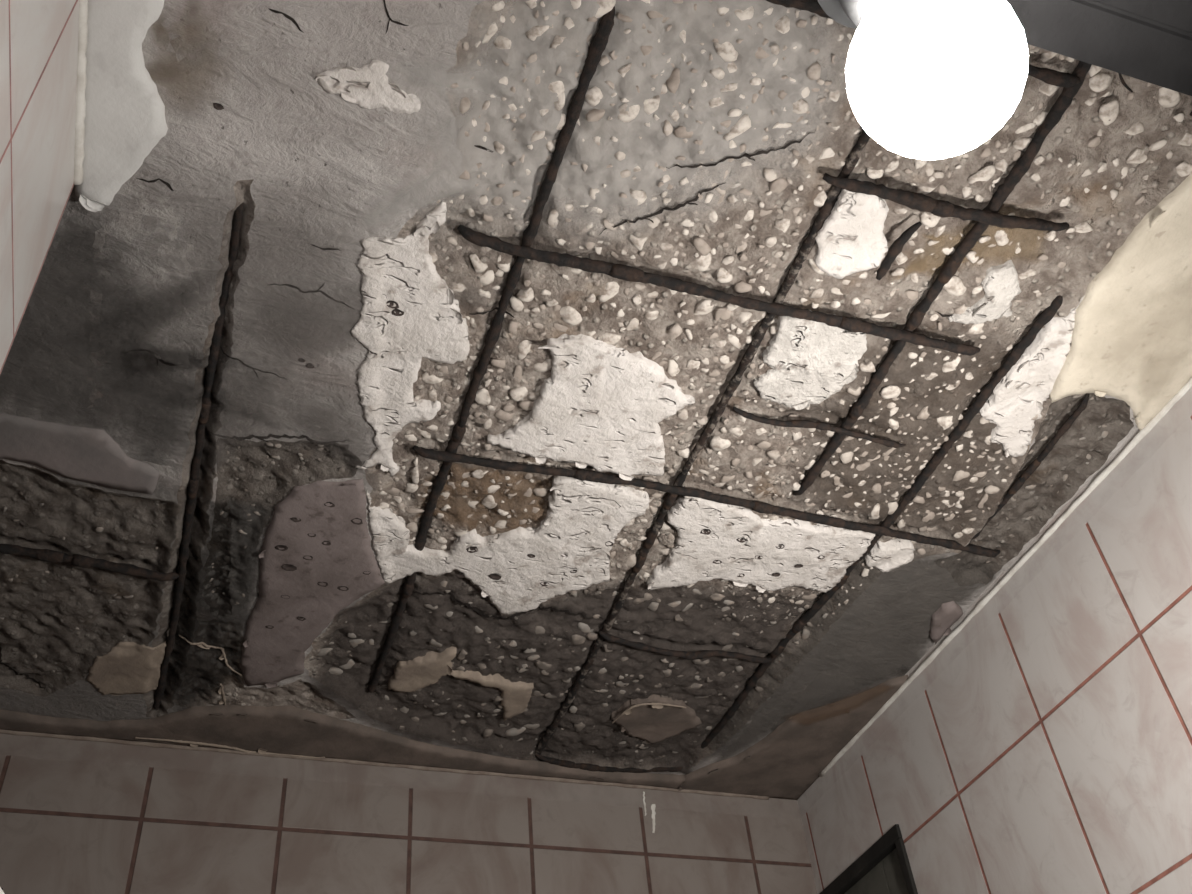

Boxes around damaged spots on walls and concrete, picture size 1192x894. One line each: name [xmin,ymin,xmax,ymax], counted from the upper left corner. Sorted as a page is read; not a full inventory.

crack [268,8,304,33]
crack [383,0,409,32]
flaking render [75,0,168,212]
crack [599,130,816,235]
corrosion [910,210,1038,271]
spalling [365,0,1192,770]
corrosion [421,466,546,531]